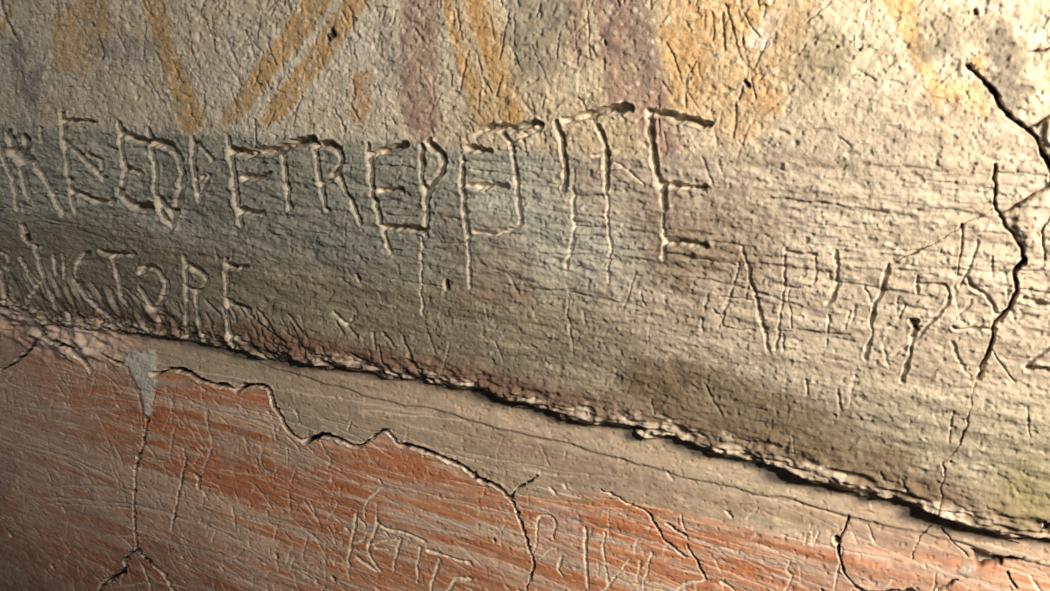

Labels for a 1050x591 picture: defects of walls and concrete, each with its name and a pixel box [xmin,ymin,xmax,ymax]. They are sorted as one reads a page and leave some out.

crack [1025,46,1050,54]
crack [835,63,1050,591]
crack [0,328,124,373]
spalling [313,352,476,390]
spalling [524,398,736,458]
crack [150,365,538,590]
spalling [785,459,887,498]
crack [97,415,176,591]
spalling [901,491,980,528]
spalling [831,533,842,547]